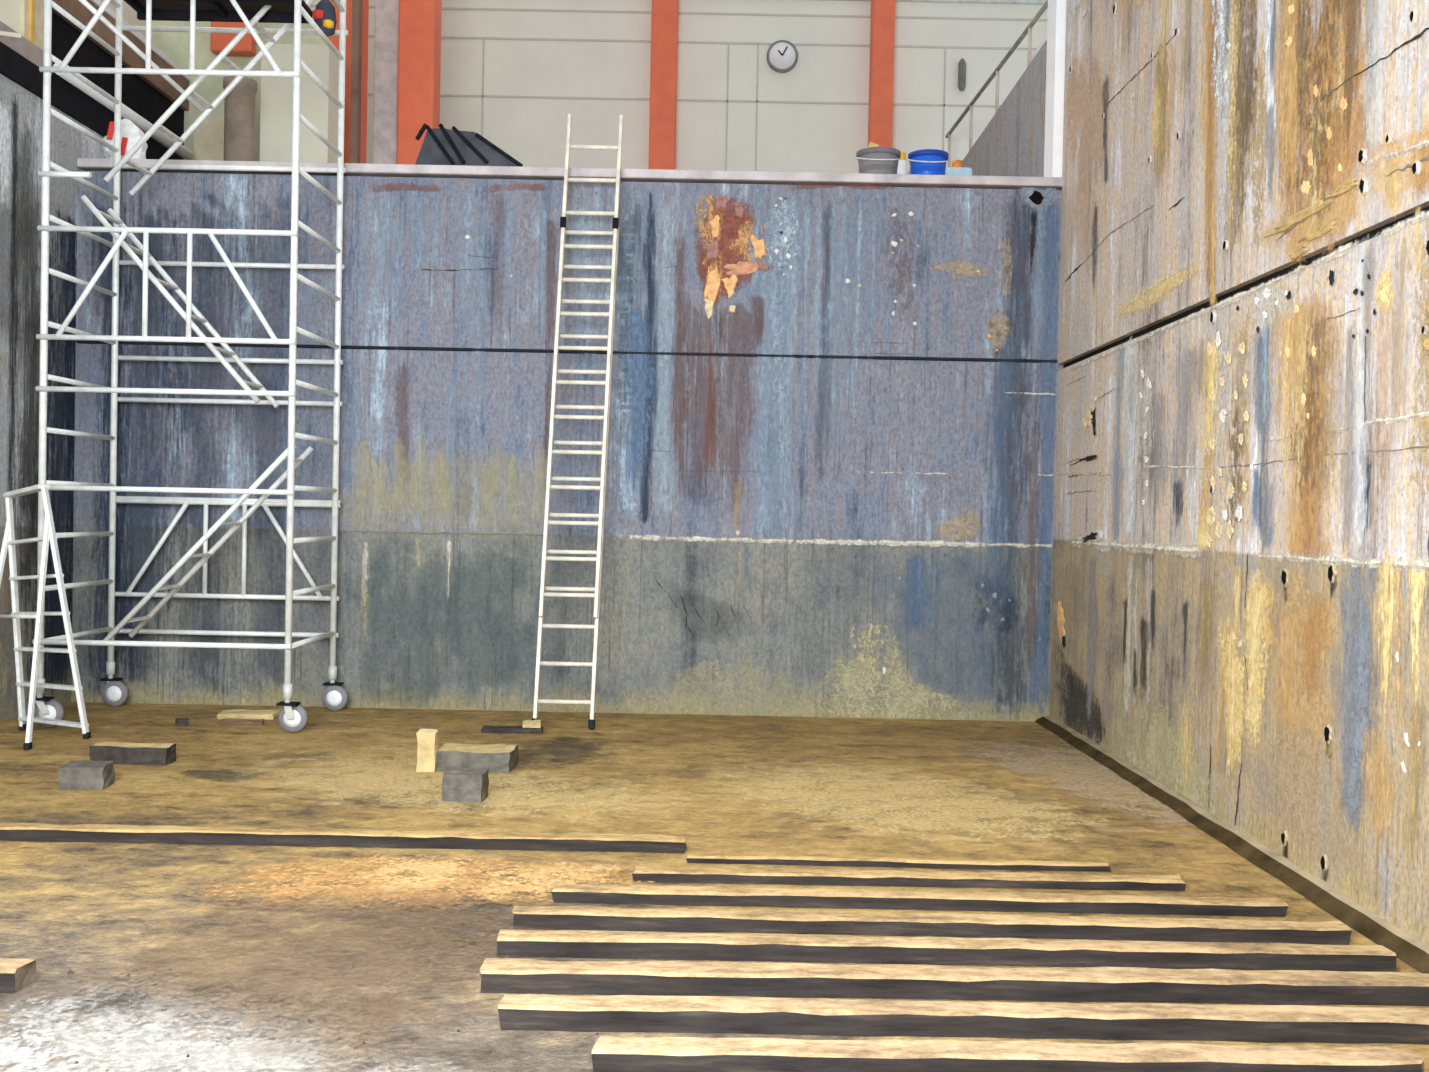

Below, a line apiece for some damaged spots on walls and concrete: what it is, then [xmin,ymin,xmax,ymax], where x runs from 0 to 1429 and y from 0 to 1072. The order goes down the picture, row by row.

corrosion [1117,0,1429,317]
water stain [0,99,131,691]
water stain [338,531,541,606]
corrosion [671,236,721,486]
corrosion [752,298,764,345]
water stain [611,188,1429,836]
corrosion [1200,561,1274,777]
corrosion [1272,297,1337,556]
corrosion [1375,208,1429,501]